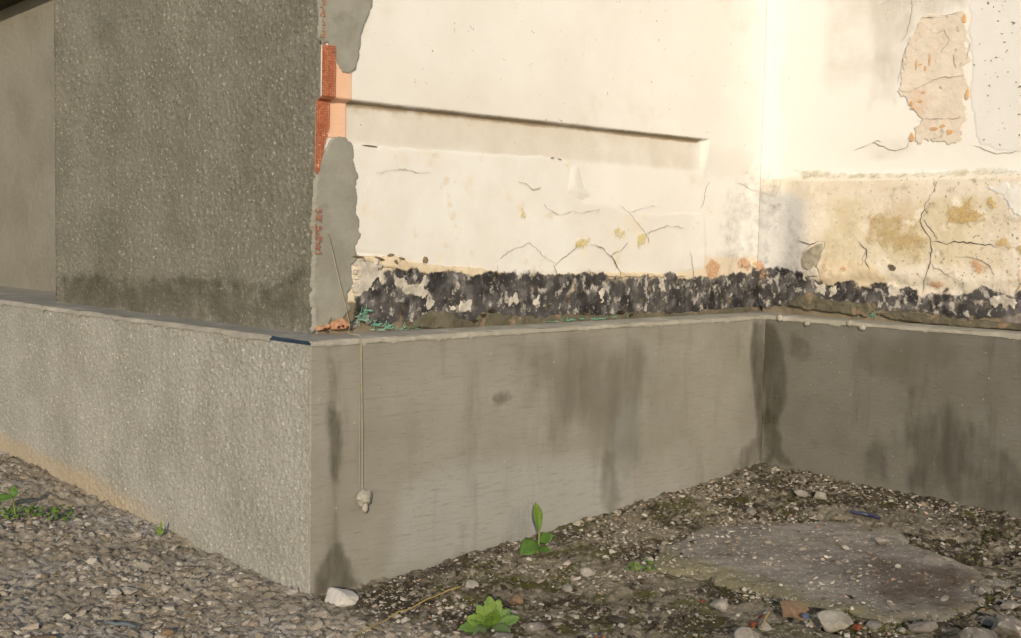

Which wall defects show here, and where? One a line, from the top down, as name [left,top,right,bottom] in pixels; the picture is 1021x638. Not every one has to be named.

spalling [898,11,972,145]
crack [495,205,681,284]
leakage [866,215,927,258]
crack [920,182,994,281]
leakage [947,198,986,224]
peeling [988,182,1021,217]
spalling [315,318,350,331]
spalling [788,244,1021,331]
leakage [753,319,1021,518]